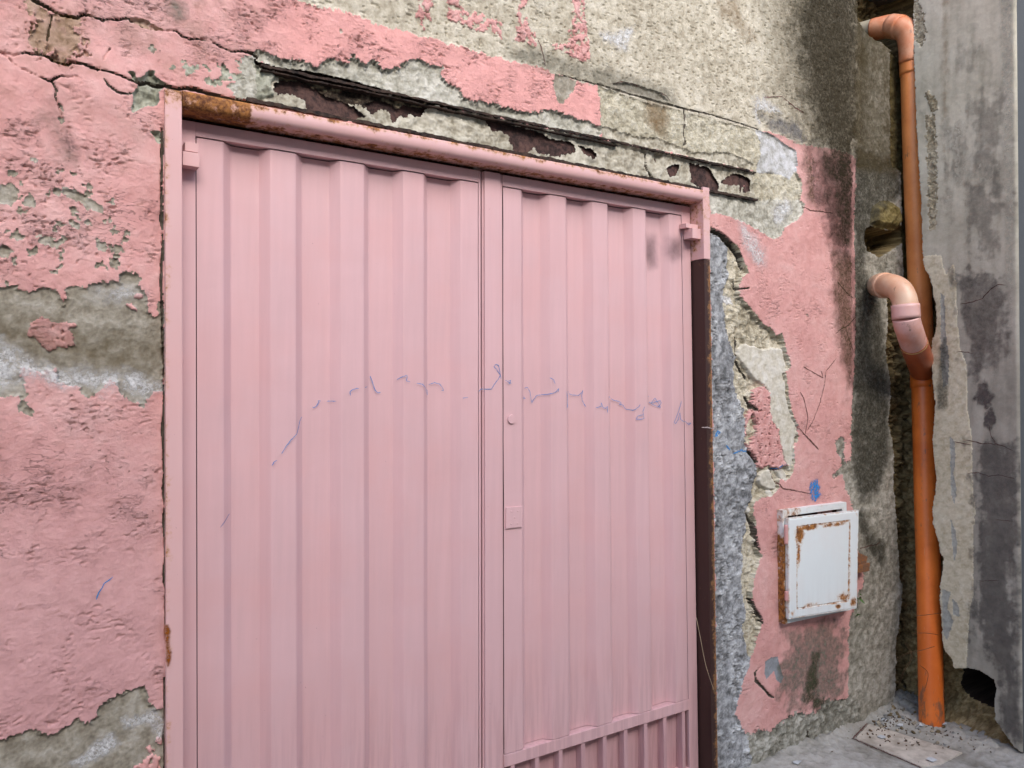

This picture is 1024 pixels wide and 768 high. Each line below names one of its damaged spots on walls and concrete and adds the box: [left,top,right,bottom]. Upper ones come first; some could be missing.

peeling [23,0,92,65]
crack [21,0,246,102]
spalling [128,70,166,113]
peeling [169,0,927,239]
peeling [0,168,164,417]
spalling [721,241,799,658]
crack [796,283,855,450]
water stain [796,0,901,496]
water stain [952,277,1023,739]
peeling [0,686,164,768]
corrosion [164,625,172,666]
spalling [943,644,1018,750]